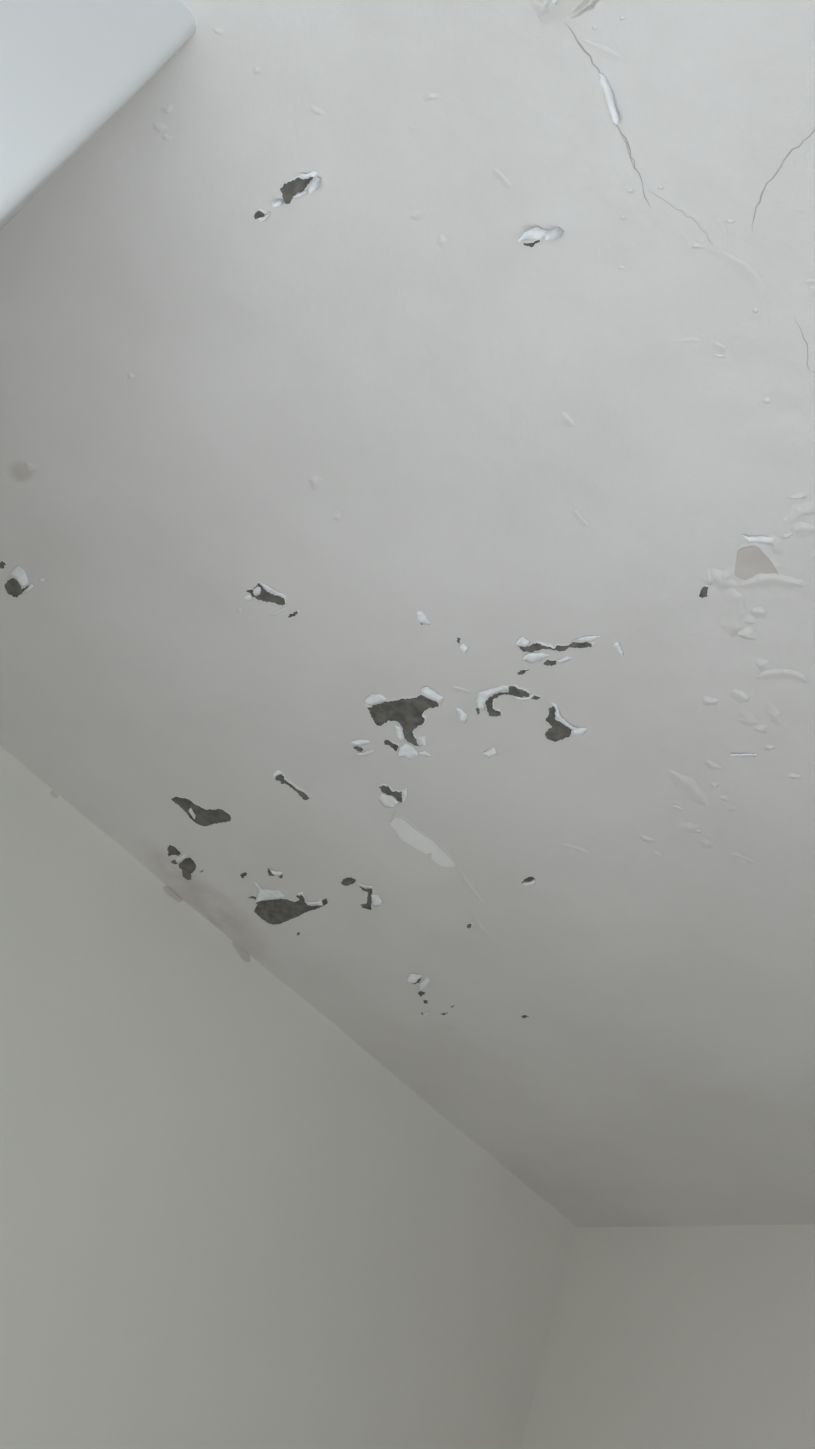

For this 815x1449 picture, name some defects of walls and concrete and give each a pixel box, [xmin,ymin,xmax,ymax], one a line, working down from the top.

peeling [530,0,599,26]
crack [568,15,634,168]
peeling [252,170,321,222]
crack [752,128,815,232]
peeling [518,227,564,249]
peeling [0,558,46,598]
peeling [235,580,300,619]
peeling [351,635,623,760]
peeling [271,770,312,801]
peeling [170,795,233,827]
peeling [240,866,330,936]
peeling [340,876,383,911]